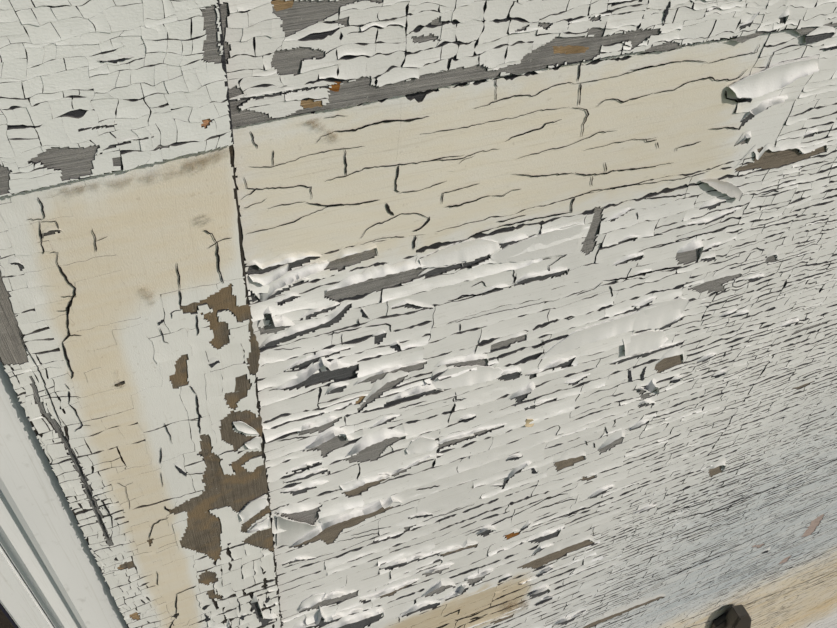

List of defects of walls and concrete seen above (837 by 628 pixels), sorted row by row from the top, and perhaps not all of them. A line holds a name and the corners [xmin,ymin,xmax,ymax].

peeling [202,2,231,63]
peeling [228,0,689,128]
peeling [727,22,837,171]
crack [204,44,802,303]
peeling [0,270,28,364]
crack [17,198,113,540]
crack [160,264,199,343]
crack [190,386,202,432]
peeling [169,206,764,565]
crack [449,270,549,331]
peeling [198,569,278,628]
peeling [292,524,496,628]